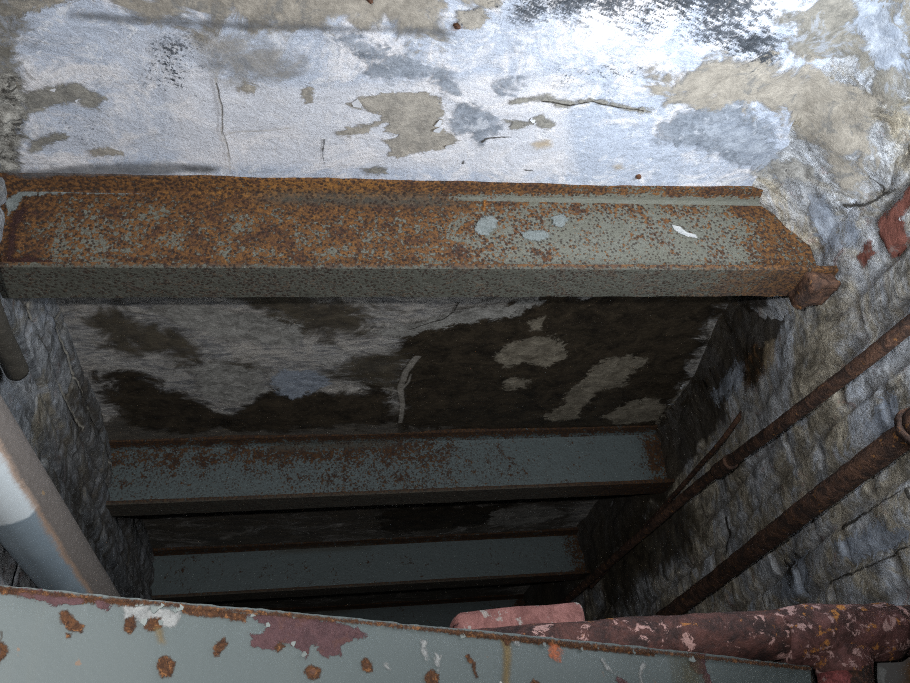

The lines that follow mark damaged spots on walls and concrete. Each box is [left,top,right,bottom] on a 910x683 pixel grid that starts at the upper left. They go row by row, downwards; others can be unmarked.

mould [496,0,784,72]
crack [215,79,234,158]
crack [510,93,656,114]
corrosion [3,204,53,262]
water stain [81,296,751,435]
corrosion [743,343,766,396]
peeling [245,613,368,660]
corrosion [0,586,811,683]